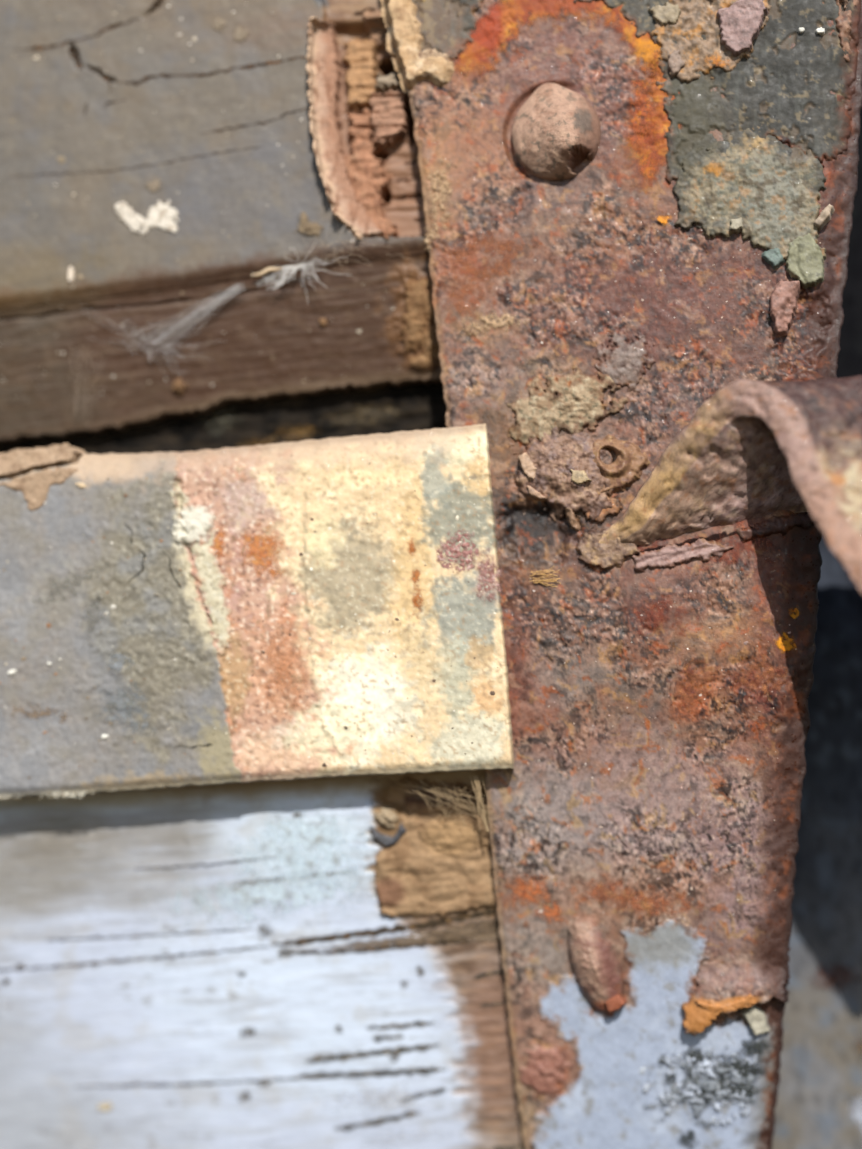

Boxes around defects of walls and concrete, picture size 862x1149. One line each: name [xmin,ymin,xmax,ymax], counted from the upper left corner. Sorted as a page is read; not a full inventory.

crack [21,0,306,112]
peeling [380,0,484,93]
rust [456,0,771,180]
peeling [656,0,861,289]
rust [769,280,801,336]
spalling [0,443,87,511]
rust [575,512,816,573]
crack [139,857,346,884]
crack [0,908,496,972]
crack [85,1021,446,1131]
peeling [530,917,780,1149]
rust [681,947,791,1037]